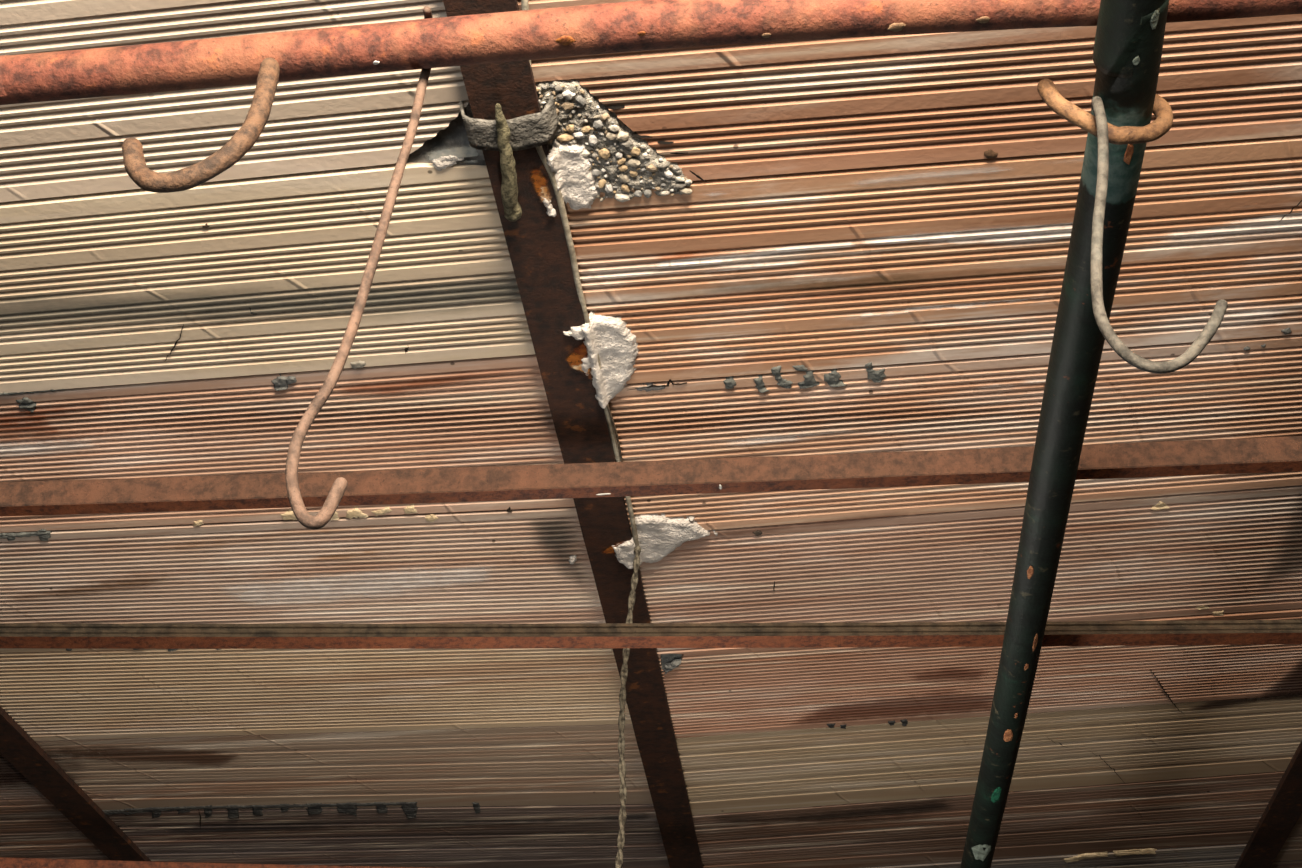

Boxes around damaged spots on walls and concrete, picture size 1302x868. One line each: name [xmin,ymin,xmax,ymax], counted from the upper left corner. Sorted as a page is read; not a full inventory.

spalling [536,79,693,202]
peeling [541,198,556,217]
peeling [563,326,584,340]
peeling [581,355,591,376]
peeling [613,537,635,569]
leakage [49,749,231,763]